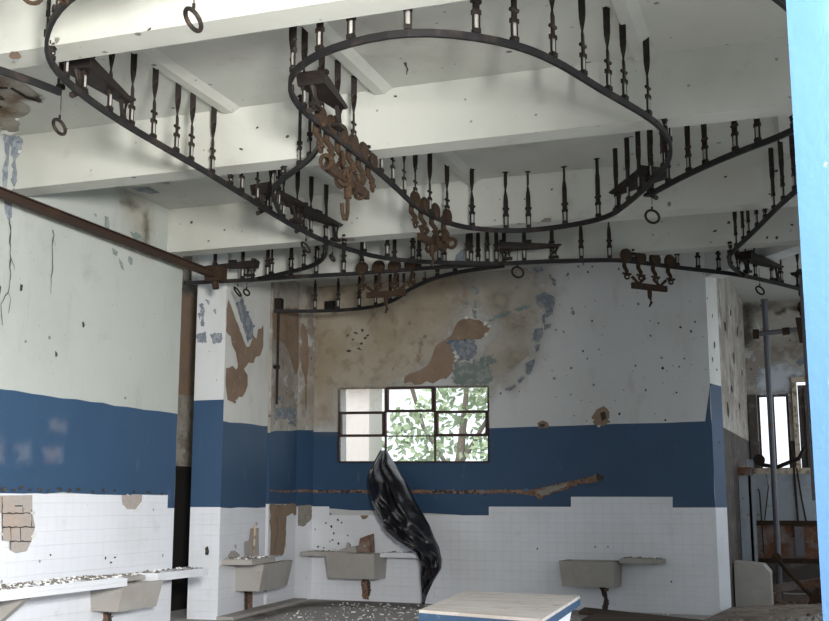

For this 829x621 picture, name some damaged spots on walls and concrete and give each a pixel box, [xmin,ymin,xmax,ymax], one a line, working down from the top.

crack [1,221,15,325]
flaking render [196,297,309,427]
flaking render [404,266,556,391]
flaking render [591,406,621,427]
peeling [0,486,81,553]
peeling [92,489,163,509]
peeling [228,522,259,558]
flaking render [269,502,313,556]